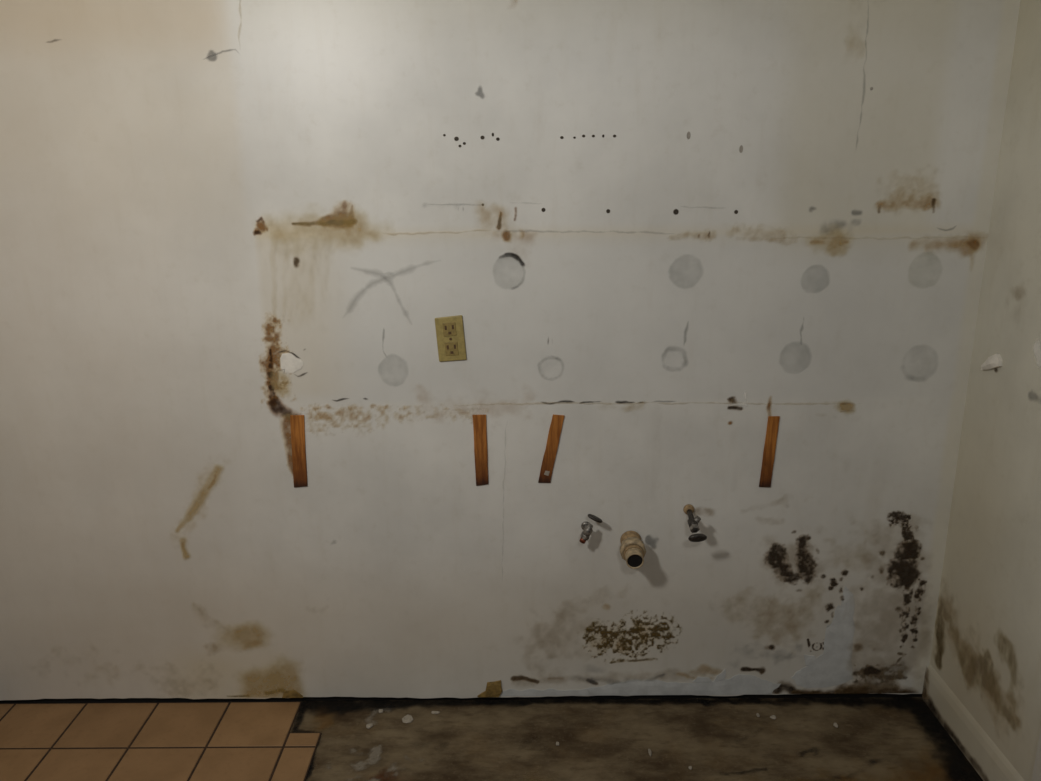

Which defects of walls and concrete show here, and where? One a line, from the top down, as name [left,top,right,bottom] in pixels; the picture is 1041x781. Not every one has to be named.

damp [765,531,848,623]
mould [880,511,927,648]
mould [583,611,681,664]
damp [935,602,946,669]
damp [853,666,893,679]